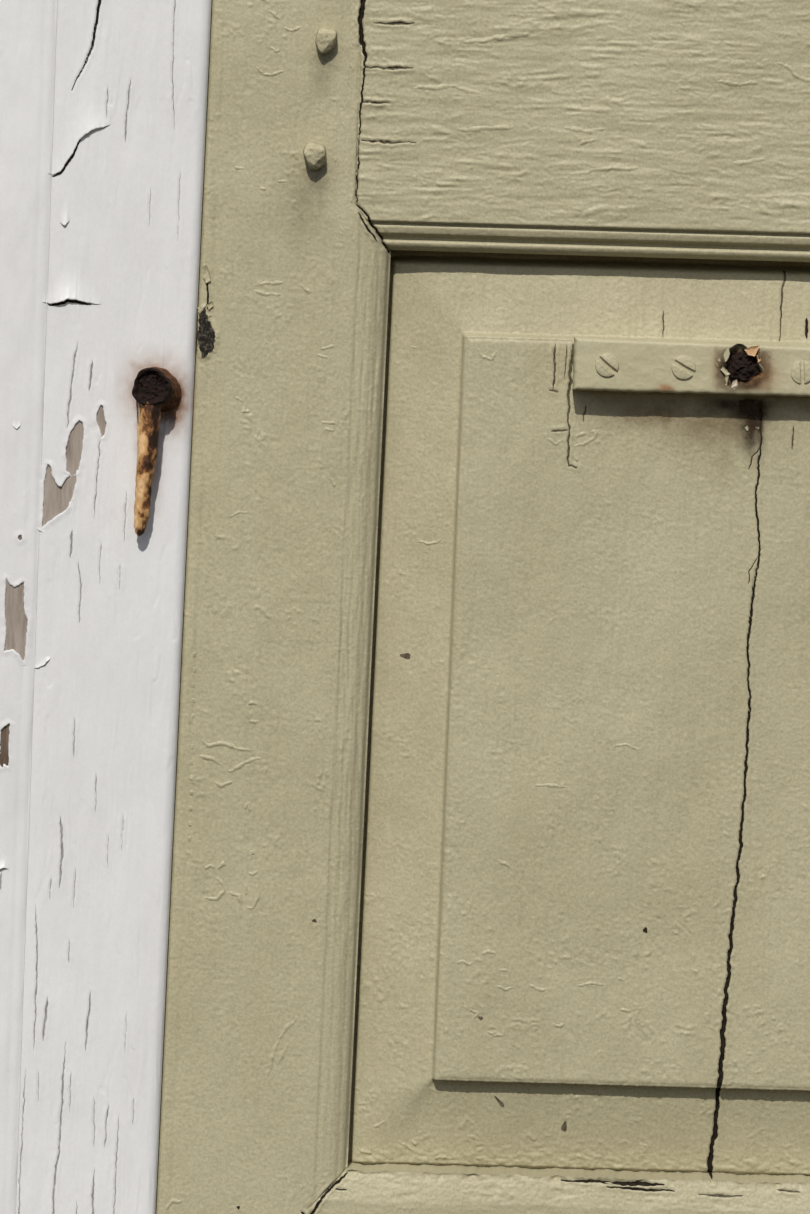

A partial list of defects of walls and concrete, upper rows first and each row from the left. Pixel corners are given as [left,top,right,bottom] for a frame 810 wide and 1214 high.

crack [71,0,101,91]
peeling [48,88,111,177]
crack [106,80,131,141]
crack [355,0,416,253]
peeling [42,261,101,306]
peeling [196,265,221,362]
rust [718,350,767,440]
peeling [12,399,112,546]
peeling [0,572,51,668]
peeling [0,718,16,773]
crack [561,403,763,1197]
crack [301,1172,348,1214]